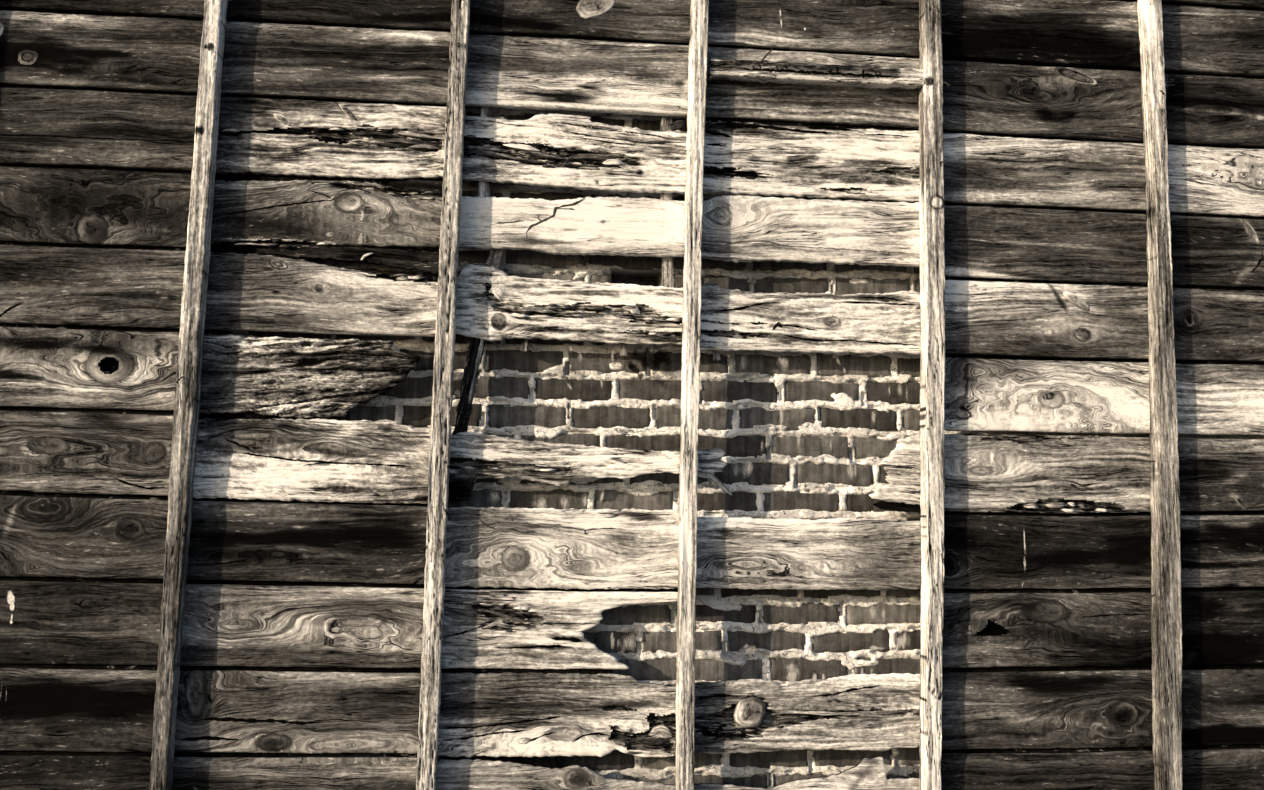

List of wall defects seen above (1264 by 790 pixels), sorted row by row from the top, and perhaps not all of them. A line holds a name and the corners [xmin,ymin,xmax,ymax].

crack [495,198,585,243]